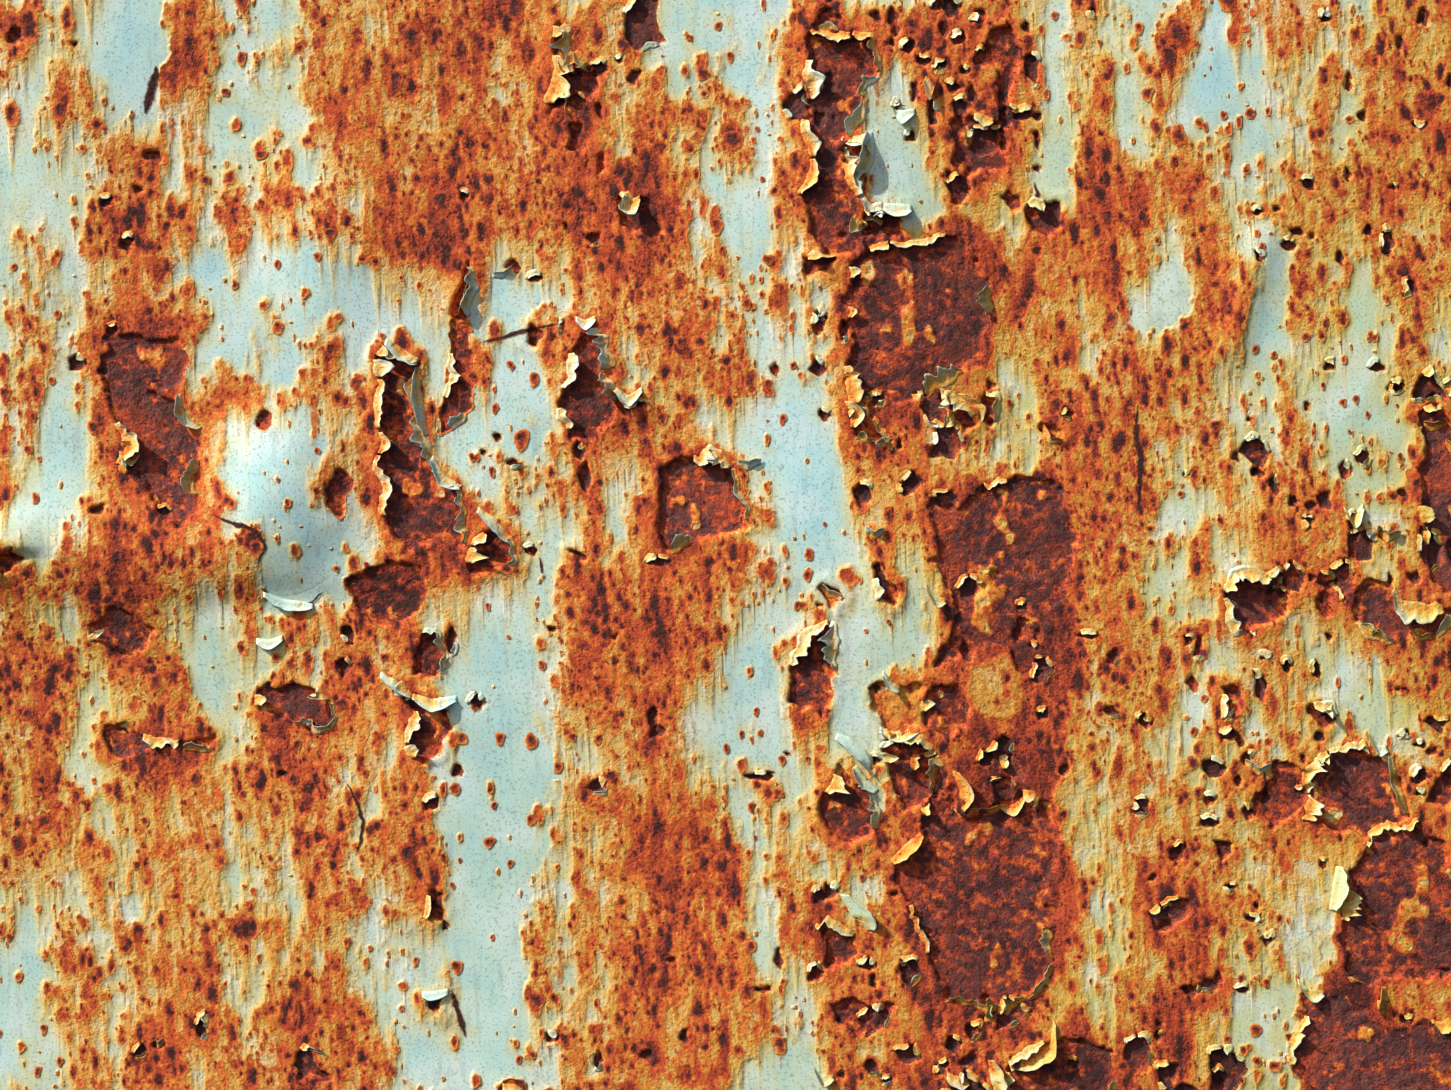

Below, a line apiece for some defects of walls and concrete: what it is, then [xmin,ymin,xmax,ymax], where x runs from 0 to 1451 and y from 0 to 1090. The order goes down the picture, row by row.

peeling [782,0,1042,459]
peeling [1001,191,1061,234]
peeling [69,320,202,528]
rust [0,0,788,1090]
peeling [380,627,485,761]
peeling [344,260,542,624]
peeling [528,315,650,493]
peeling [643,444,761,566]
peeling [788,584,843,715]
peeling [896,470,1079,683]
rust [760,0,1451,1090]
peeling [807,671,1249,1090]